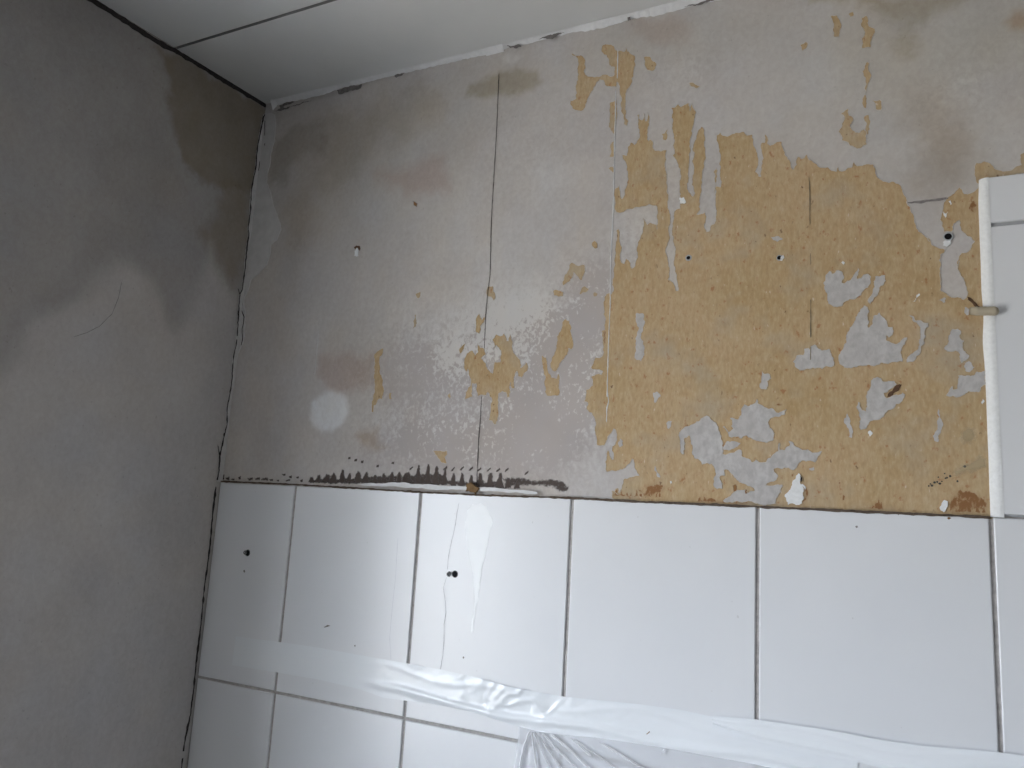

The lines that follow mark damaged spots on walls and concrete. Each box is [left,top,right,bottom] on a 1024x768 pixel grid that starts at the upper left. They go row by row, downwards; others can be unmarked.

peeling [831,12,875,49]
leakage [141,38,266,298]
leakage [267,62,547,263]
peeling [553,44,1024,514]
peeling [371,348,392,412]
peeling [459,313,528,425]
peeling [542,319,574,396]